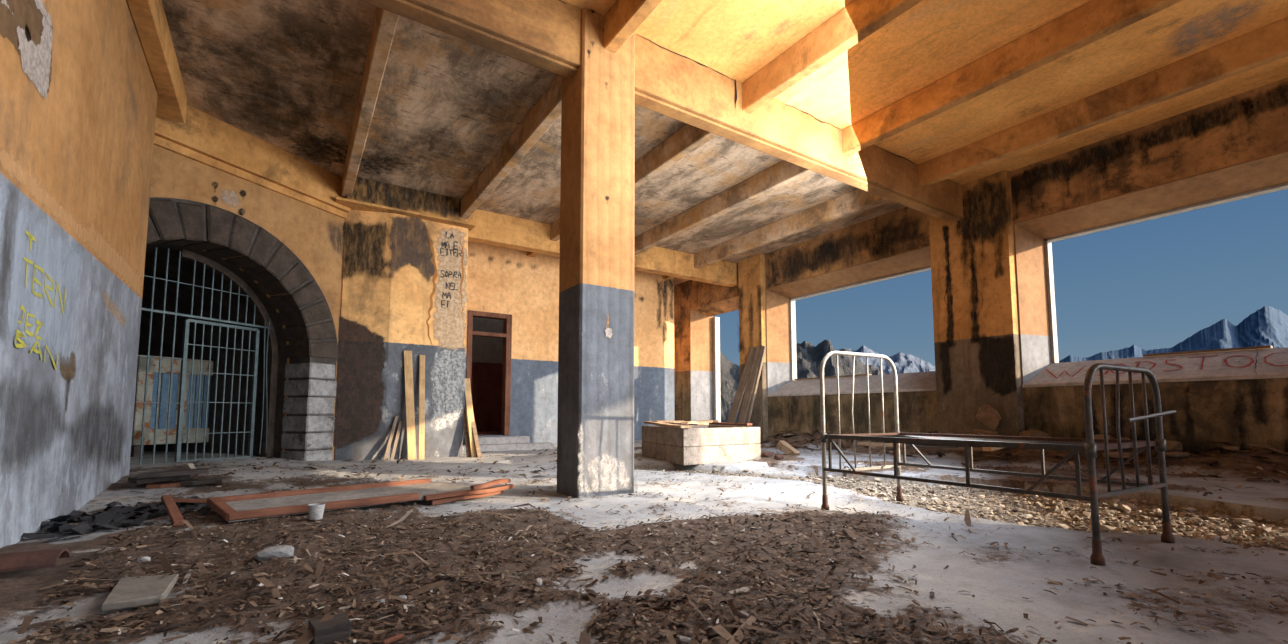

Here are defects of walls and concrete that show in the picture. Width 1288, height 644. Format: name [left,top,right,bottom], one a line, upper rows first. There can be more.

peeling [1,0,53,99]
crack [637,34,737,108]
water stain [200,30,462,281]
water stain [1011,83,1288,218]
water stain [2,193,15,308]
peeling [426,228,468,430]
water stain [738,219,920,351]
water stain [939,226,1216,453]
water stain [0,381,122,464]
water stain [1233,379,1288,453]